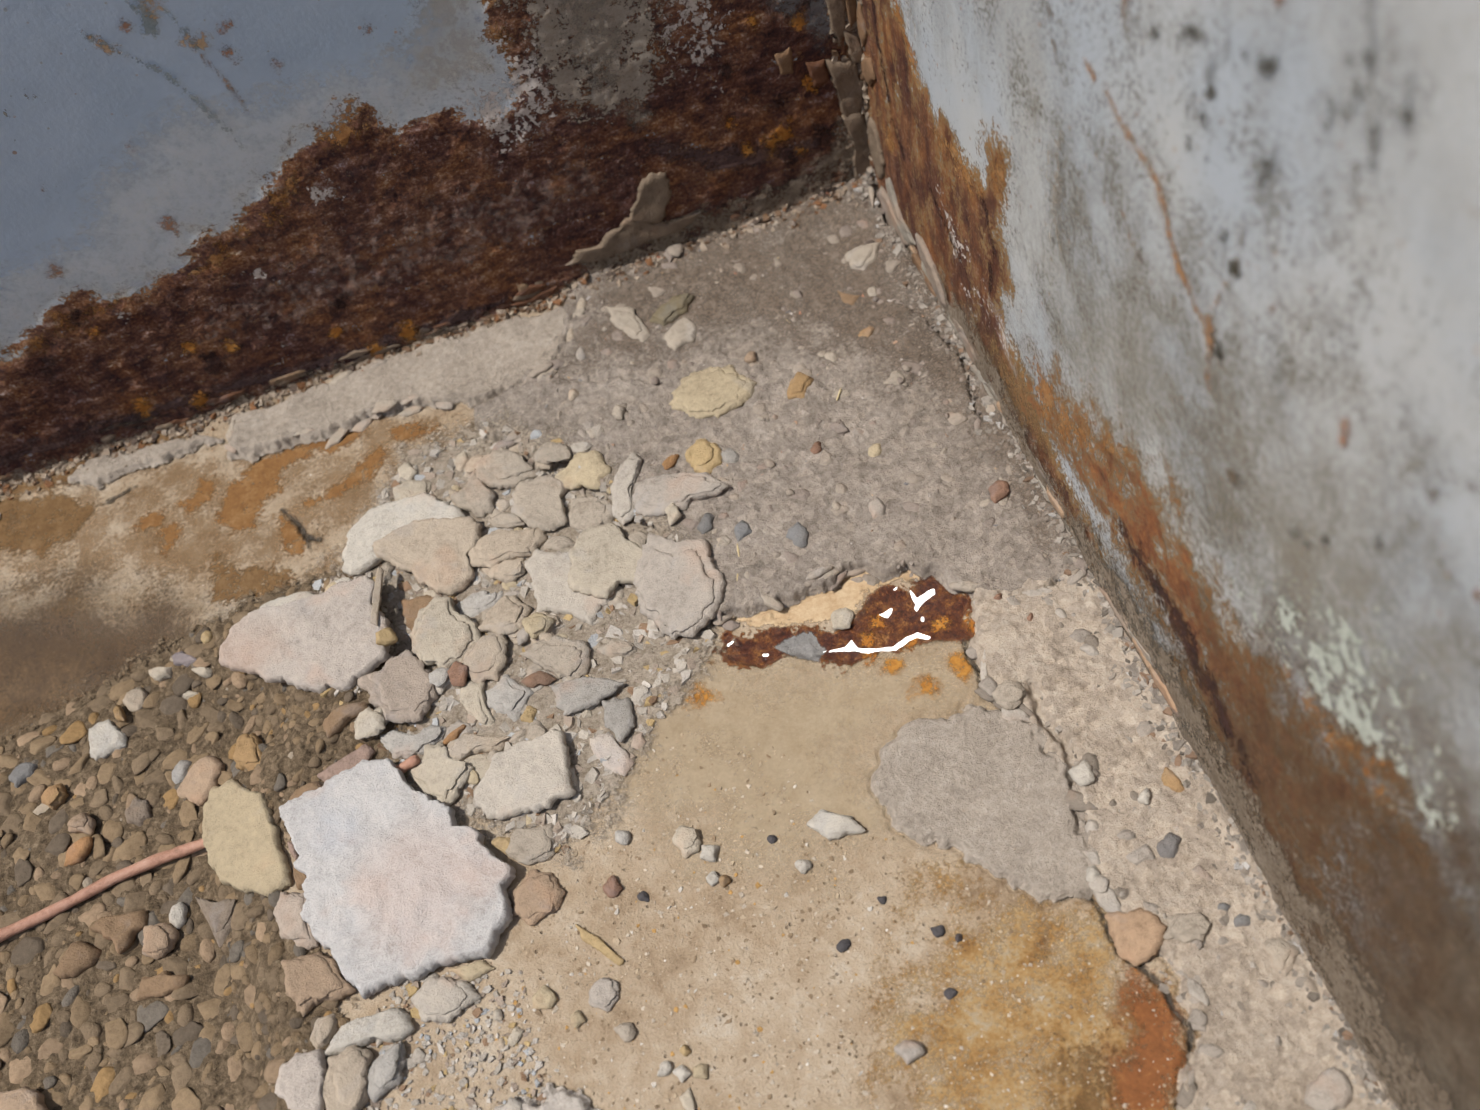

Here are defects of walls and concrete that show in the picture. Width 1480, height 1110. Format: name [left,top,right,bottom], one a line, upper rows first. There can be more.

leakage [1177,23,1203,42]
leakage [1226,41,1276,73]
leakage [1186,63,1215,149]
corrosion [845,242,881,270]
leakage [1228,260,1241,278]
corrosion [0,0,852,1110]
corrosion [804,565,880,591]
corrosion [862,0,1480,1053]
peeling [1230,557,1475,850]
corrosion [858,861,1196,1110]